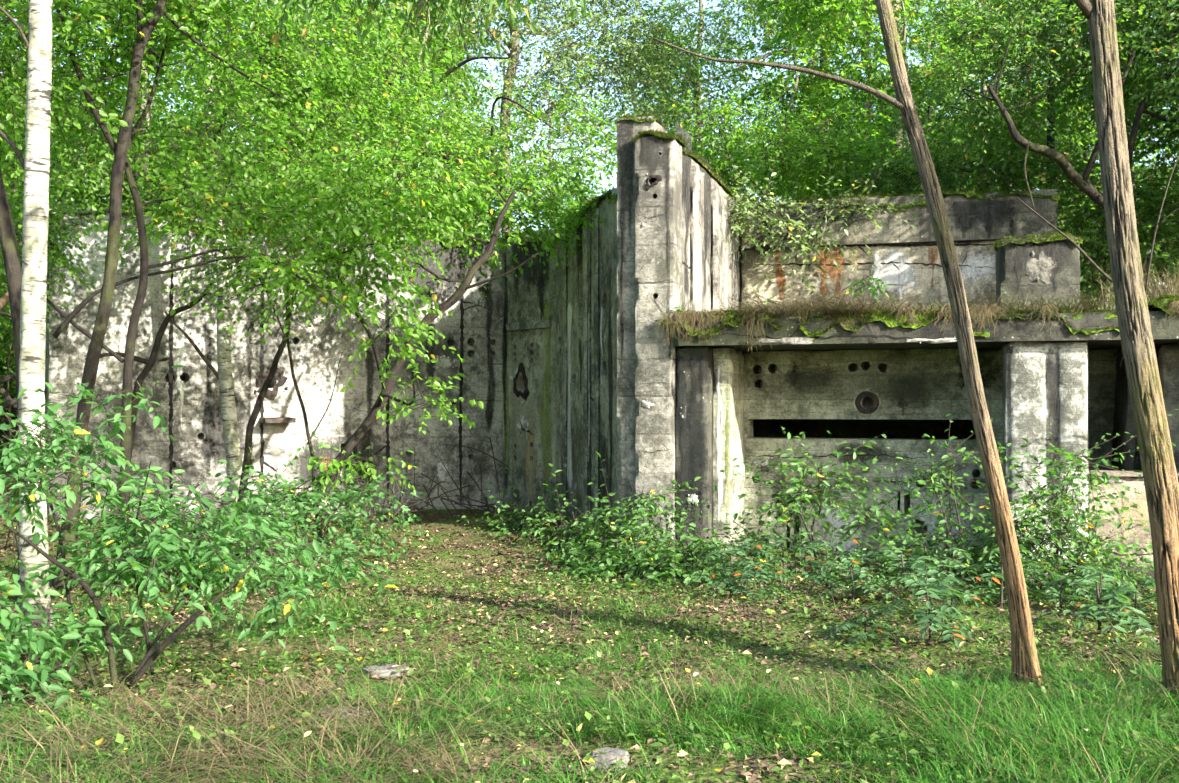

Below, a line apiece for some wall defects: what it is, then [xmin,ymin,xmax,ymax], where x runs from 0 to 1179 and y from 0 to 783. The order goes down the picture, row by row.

corrosion [775,250,785,299]
corrosion [817,247,861,298]
leakage [953,200,1072,298]
spalling [1025,251,1057,284]
leakage [567,121,729,534]